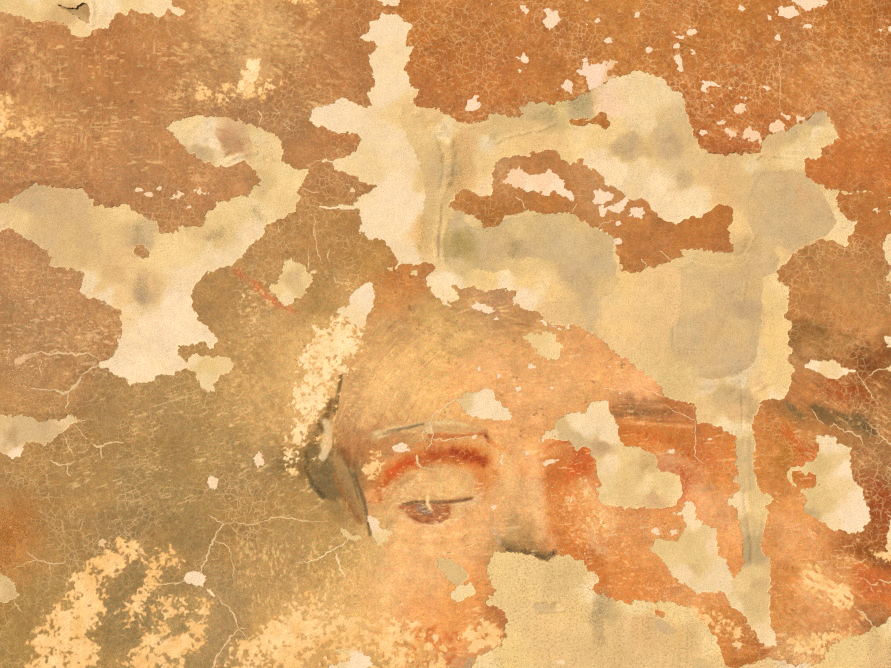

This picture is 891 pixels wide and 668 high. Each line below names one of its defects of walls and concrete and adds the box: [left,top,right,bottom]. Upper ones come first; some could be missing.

peeling [0,0,185,38]
peeling [0,57,308,392]
peeling [309,0,891,482]
peeling [283,282,375,476]
crack [14,552,67,581]
peeling [24,536,215,668]
crack [212,594,266,668]
crack [159,515,328,586]
crack [299,540,348,577]
peeling [216,551,891,668]
peeling [538,400,734,601]
peeling [787,434,871,534]